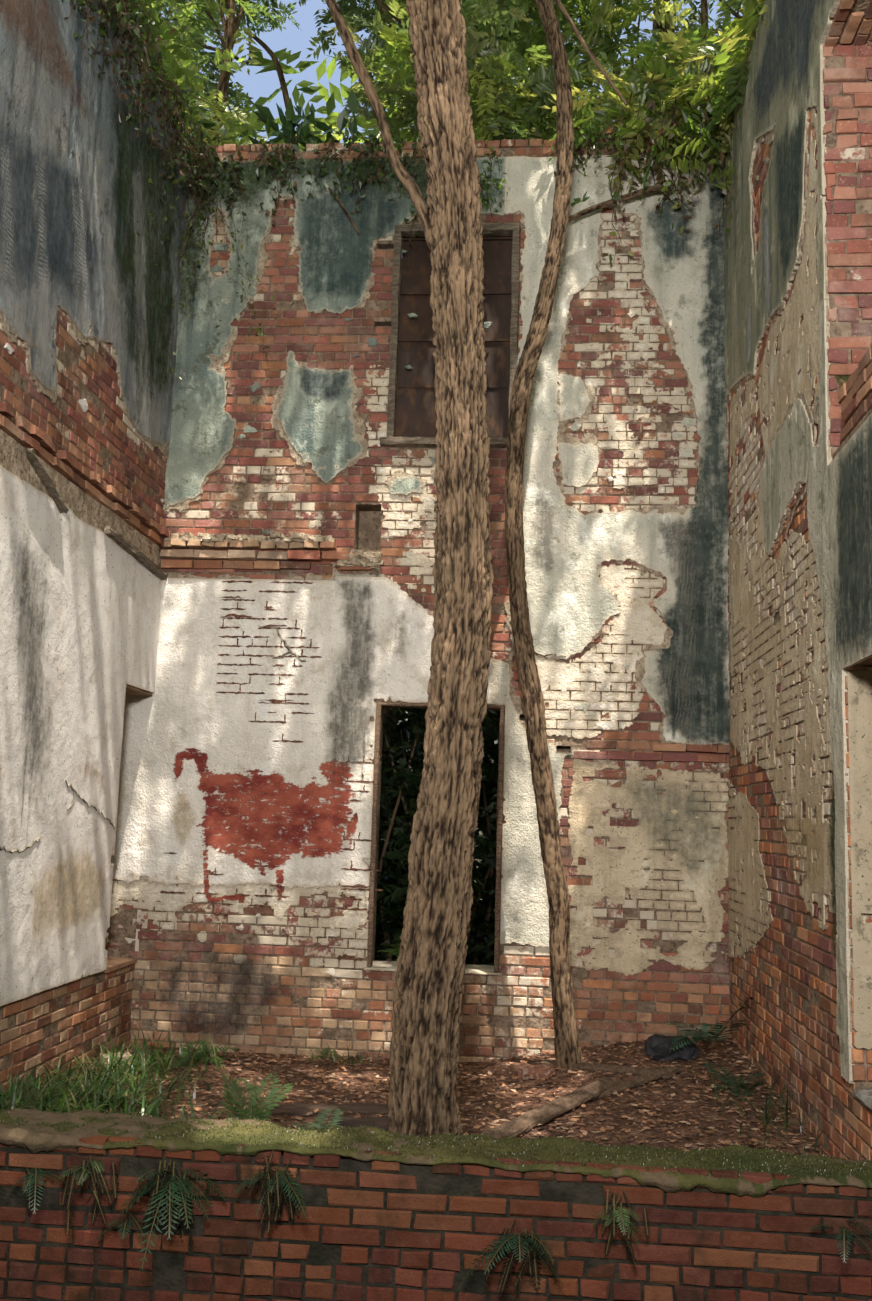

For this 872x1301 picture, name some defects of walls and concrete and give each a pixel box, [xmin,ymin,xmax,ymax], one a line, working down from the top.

water stain [0,137,121,390]
water stain [306,185,412,295]
spalling [0,196,437,743]
water stain [300,370,346,400]
spalling [488,450,526,743]
water stain [649,175,730,743]
peeling [535,59,854,1038]
water stain [836,418,872,650]
crack [0,834,41,854]
crack [65,781,116,830]
peeling [110,832,383,976]
spalling [345,755,381,802]